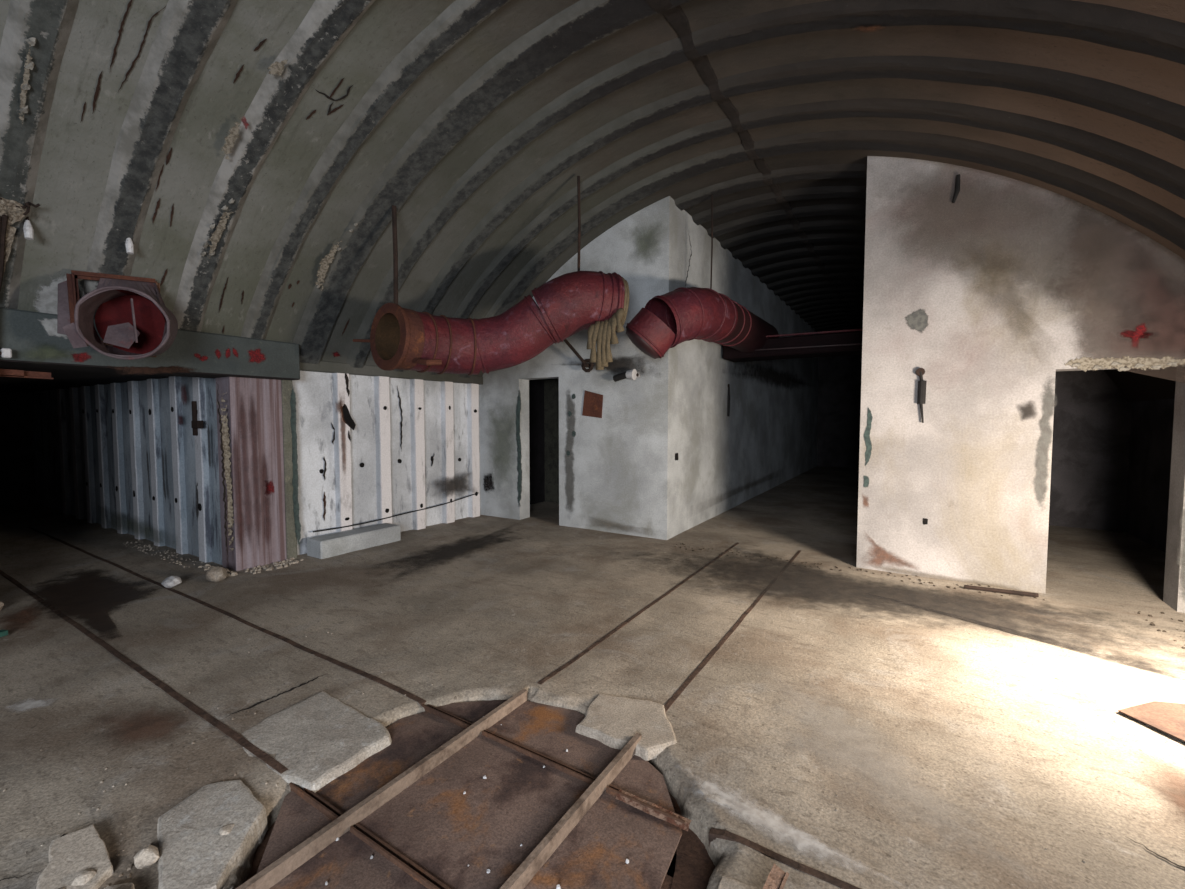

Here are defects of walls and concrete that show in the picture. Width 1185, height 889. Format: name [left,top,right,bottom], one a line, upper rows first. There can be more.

spalling [0,197,27,292]
leakage [31,570,156,638]
corrosion [616,789,692,831]